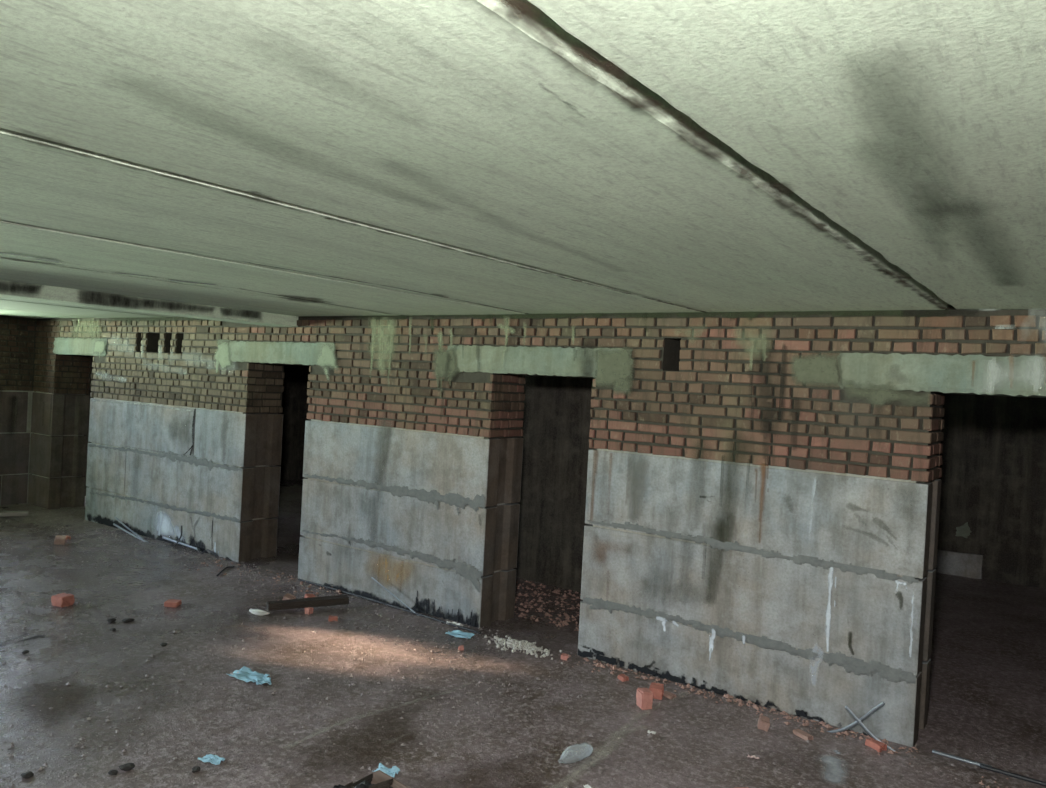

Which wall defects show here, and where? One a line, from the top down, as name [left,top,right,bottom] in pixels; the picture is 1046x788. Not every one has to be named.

damp [826,567,836,652]
damp [895,580,914,657]